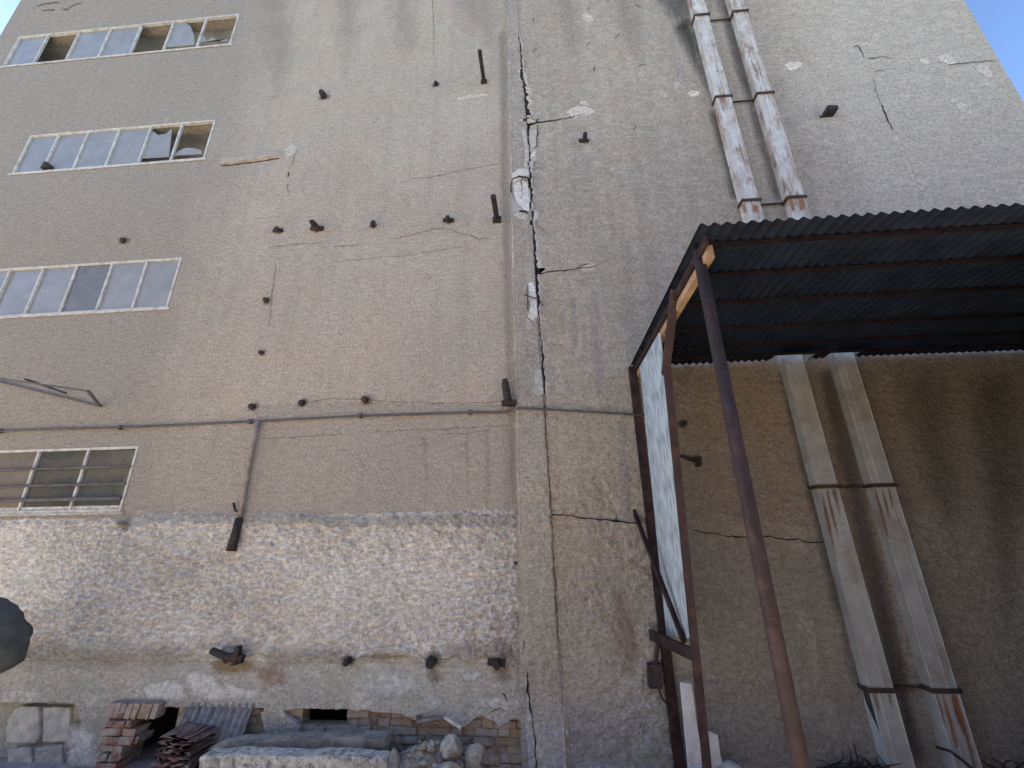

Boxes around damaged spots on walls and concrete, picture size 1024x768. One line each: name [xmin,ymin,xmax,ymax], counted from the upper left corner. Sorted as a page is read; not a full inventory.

peeling [565,101,596,119]
crack [854,45,893,130]
spalling [510,116,543,370]
crack [516,36,636,641]
crack [694,530,823,543]
corrosion [823,490,839,543]
spalling [131,707,186,760]
spalling [243,708,269,735]
spalling [288,708,521,768]
corrosion [937,695,975,768]